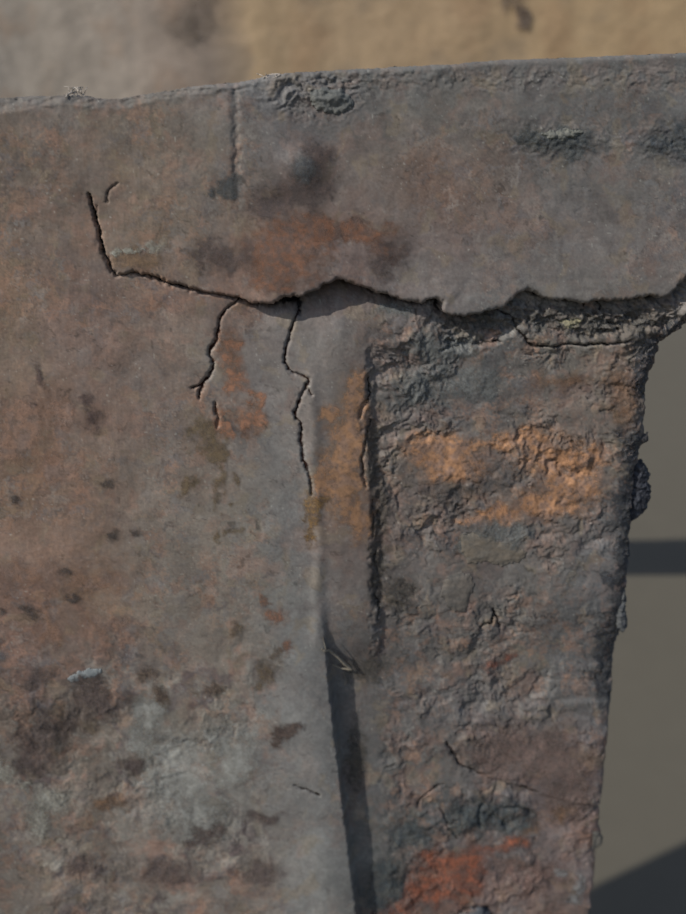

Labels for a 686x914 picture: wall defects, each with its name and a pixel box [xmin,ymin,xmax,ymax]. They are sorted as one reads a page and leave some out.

crack [91,185,116,274]
crack [191,296,312,494]
corrosion [302,371,374,541]
corrosion [405,426,602,526]
crack [446,742,537,825]